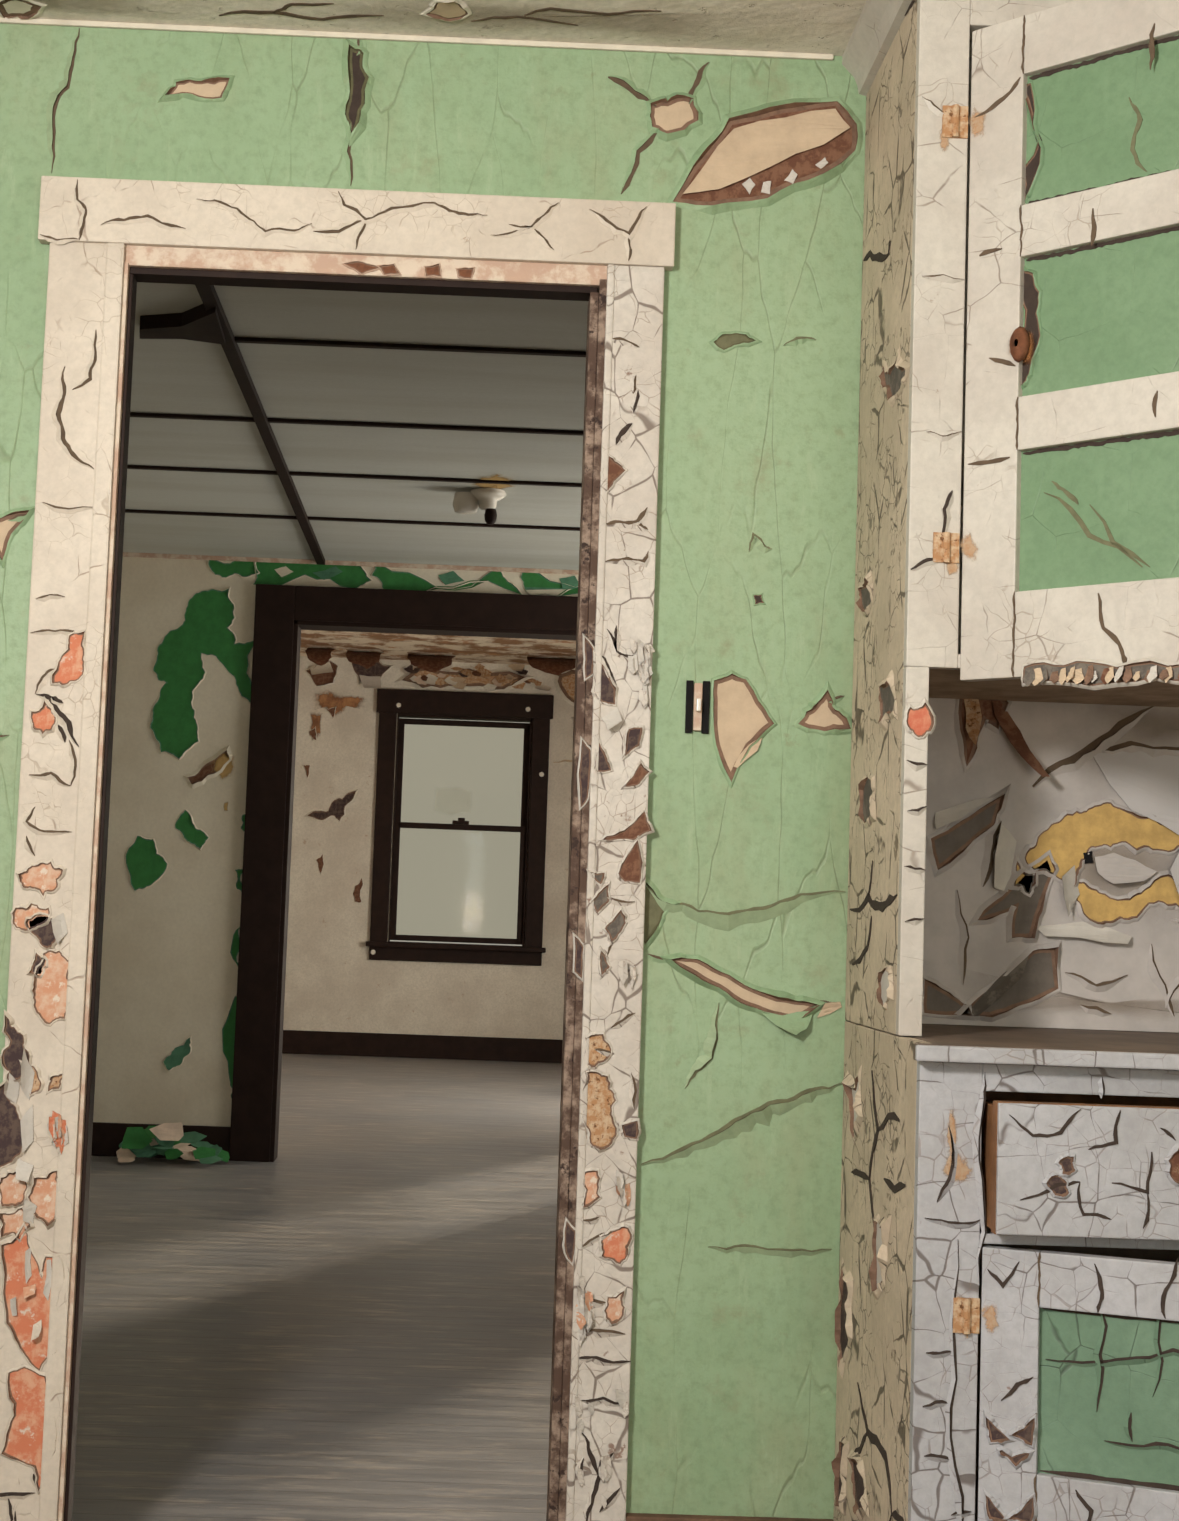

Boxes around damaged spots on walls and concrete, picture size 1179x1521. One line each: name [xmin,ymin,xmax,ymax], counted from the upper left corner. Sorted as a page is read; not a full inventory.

peeling [0,0,48,20]
crack [40,28,647,261]
peeling [608,62,863,215]
peeling [10,859,72,1027]
peeling [125,835,168,892]
peeling [174,809,210,851]
peeling [304,789,359,823]
peeling [149,560,578,789]
peeling [304,633,655,811]
peeling [572,808,842,1035]
peeling [709,670,852,789]
peeling [0,1010,68,1496]